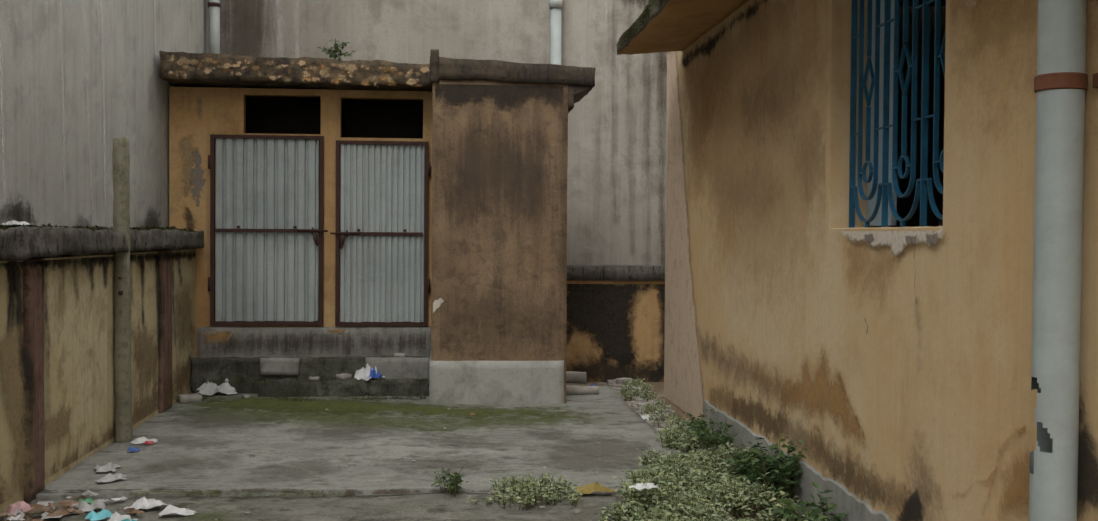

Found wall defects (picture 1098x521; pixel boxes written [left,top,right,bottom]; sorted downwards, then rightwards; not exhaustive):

damp [682,0,767,67]
flaking render [841,226,944,256]
damp [0,256,116,484]
damp [132,358,192,424]
damp [130,251,195,345]
damp [566,284,665,382]
damp [701,338,860,440]
damp [898,468,932,521]